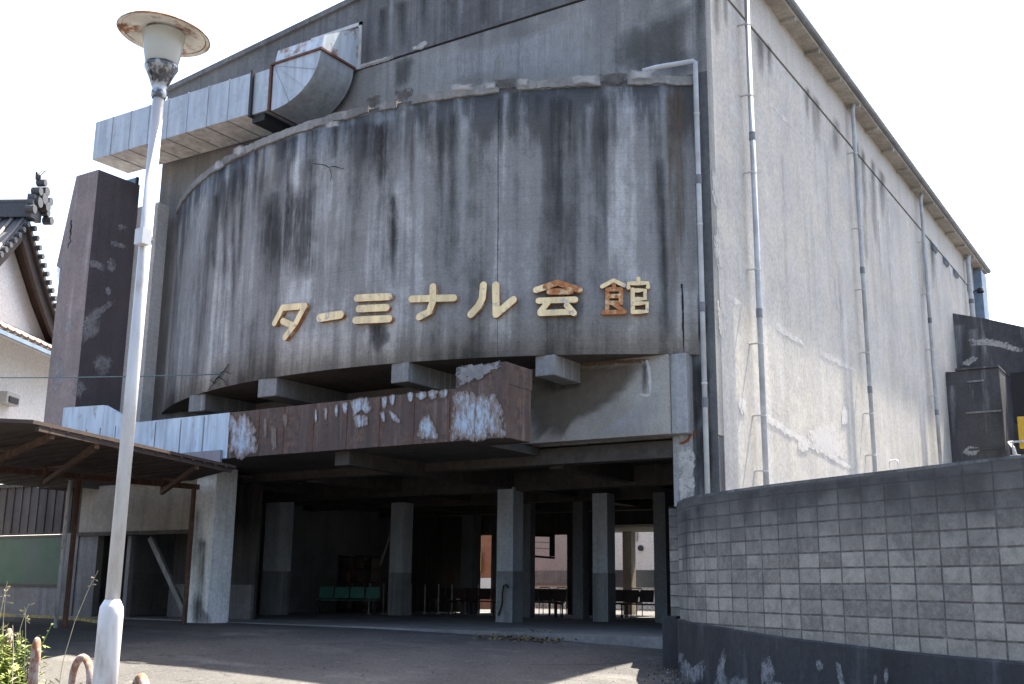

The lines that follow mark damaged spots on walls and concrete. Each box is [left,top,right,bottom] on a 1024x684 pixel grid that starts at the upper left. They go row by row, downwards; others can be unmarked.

spalling [486,78,527,91]
spalling [574,71,651,85]
peeling [63,287,111,339]
peeling [315,360,507,442]
peeling [228,413,287,460]
peeling [677,435,696,500]
peeling [679,653,703,682]
peeling [716,657,746,684]
peeling [761,661,777,684]